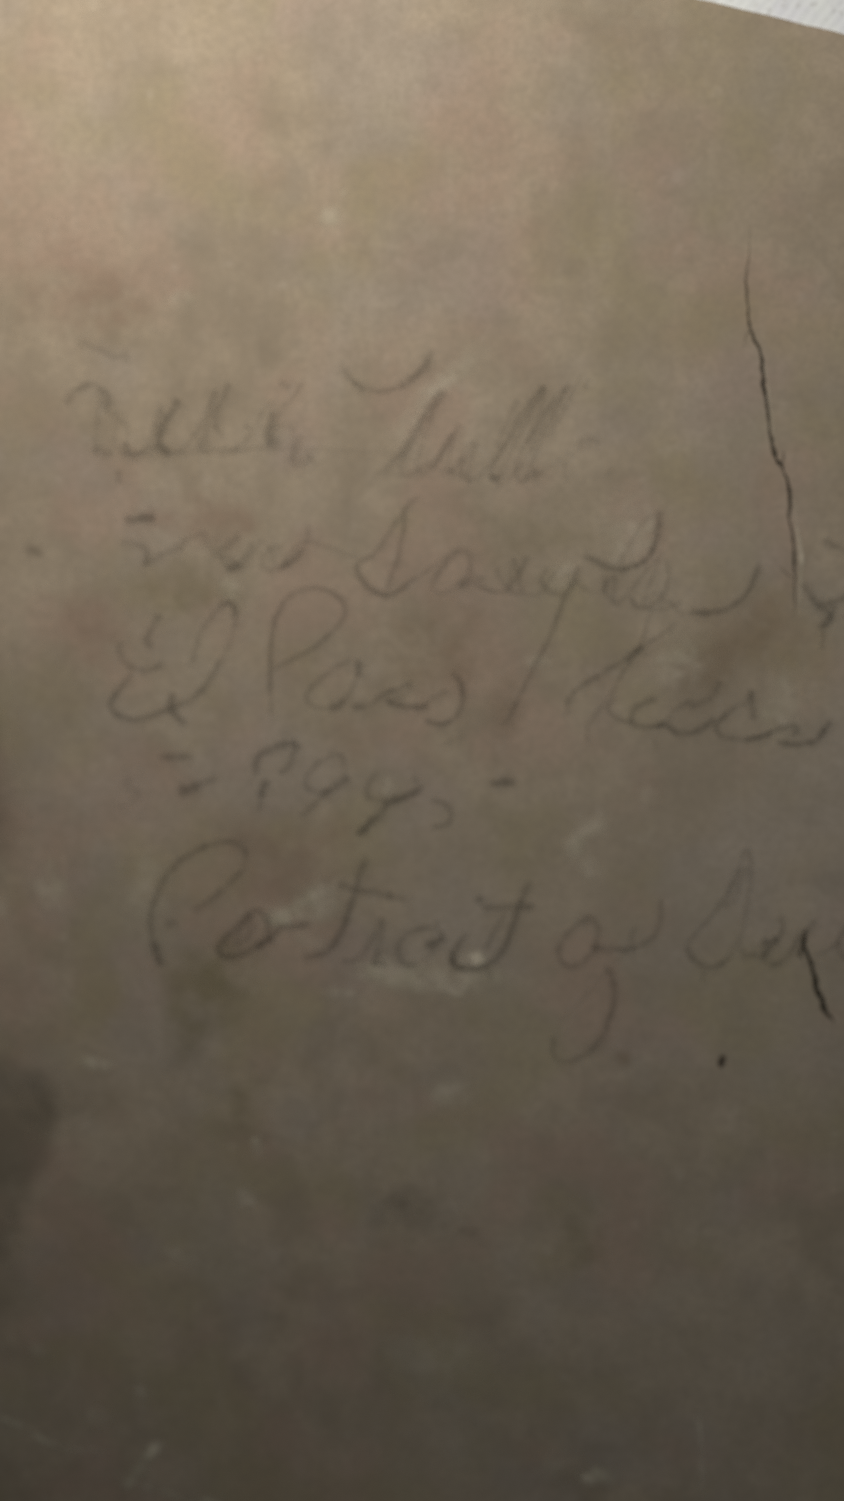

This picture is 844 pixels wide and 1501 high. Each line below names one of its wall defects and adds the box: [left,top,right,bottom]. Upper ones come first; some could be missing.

crack [745,281,803,566]
crack [802,933,831,1018]